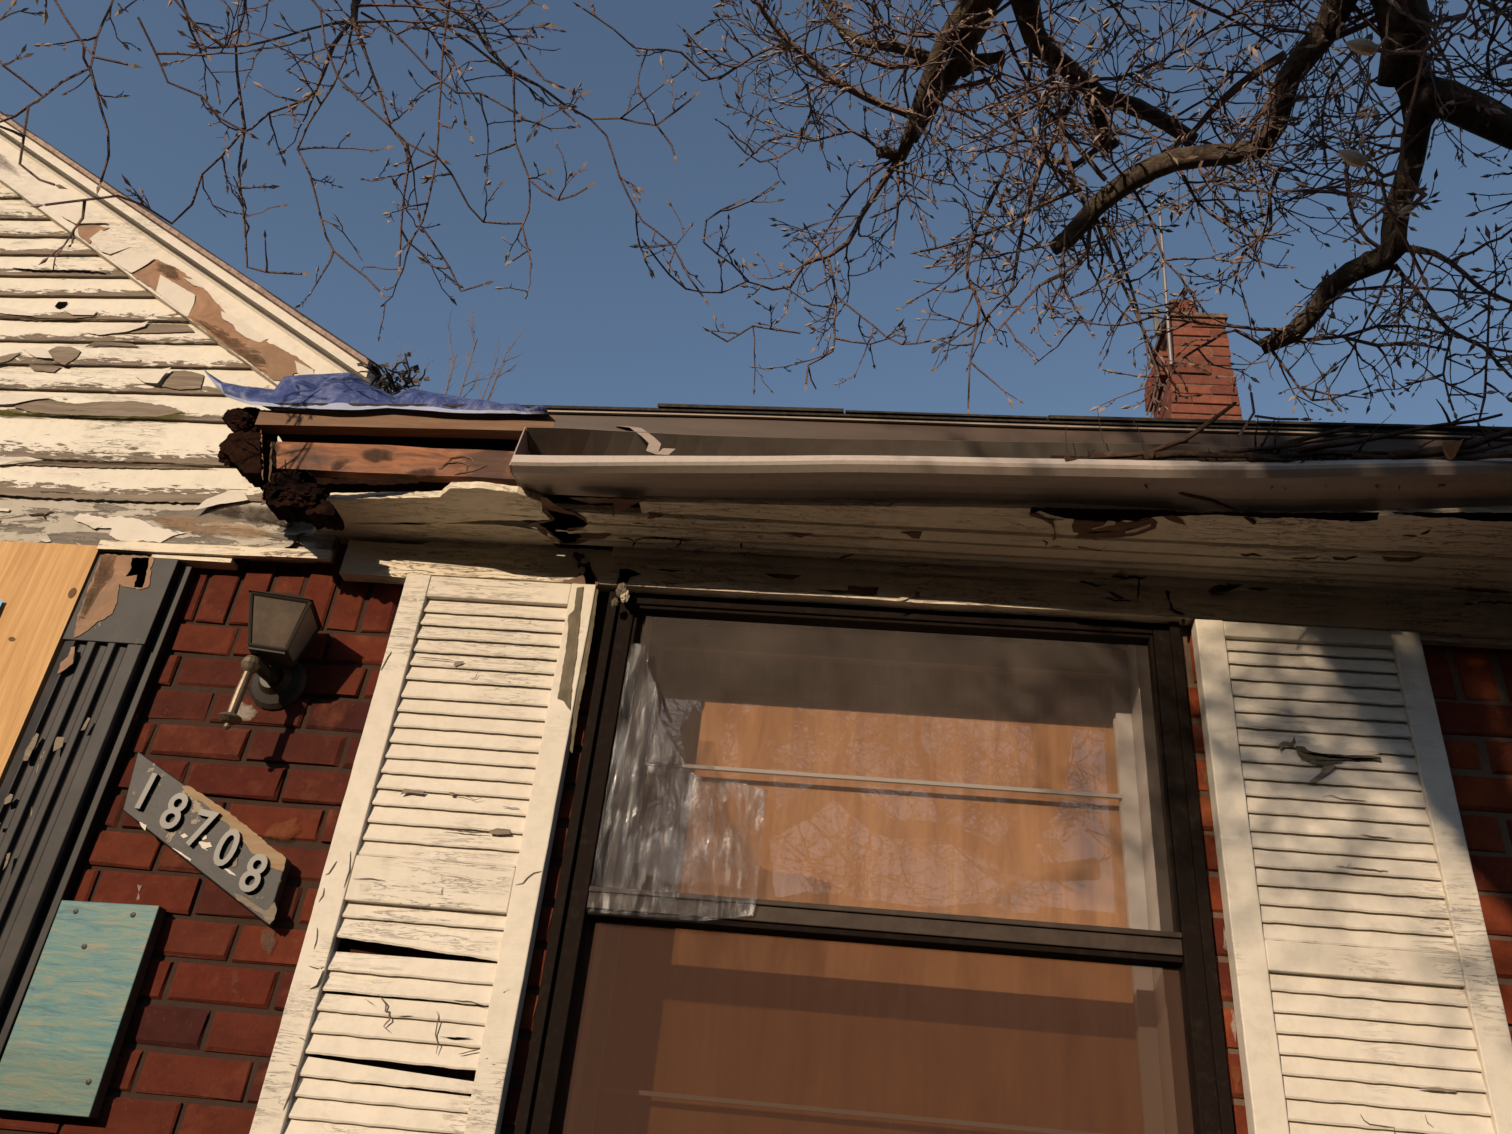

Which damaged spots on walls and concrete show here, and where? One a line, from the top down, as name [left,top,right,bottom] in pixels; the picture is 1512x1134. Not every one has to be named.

peeling [0,205,314,381]
peeling [0,367,204,417]
peeling [1029,507,1186,551]
peeling [815,585,879,595]
peeling [23,718,90,761]
peeling [1304,744,1380,756]
peeling [173,833,212,861]
peeling [182,786,286,925]
crack [367,994,485,1054]